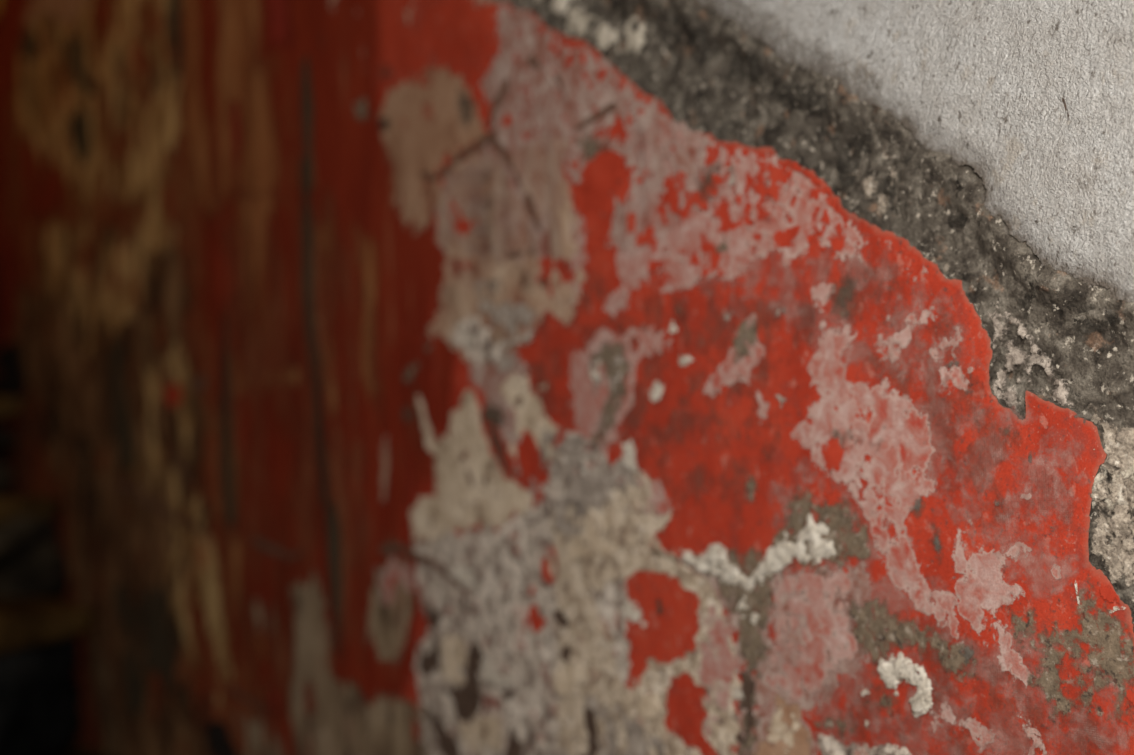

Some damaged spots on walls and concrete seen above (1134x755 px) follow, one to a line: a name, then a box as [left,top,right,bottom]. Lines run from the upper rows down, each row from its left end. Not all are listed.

spalling [289,0,1134,755]
damp [861,651,933,718]
damp [816,717,912,755]